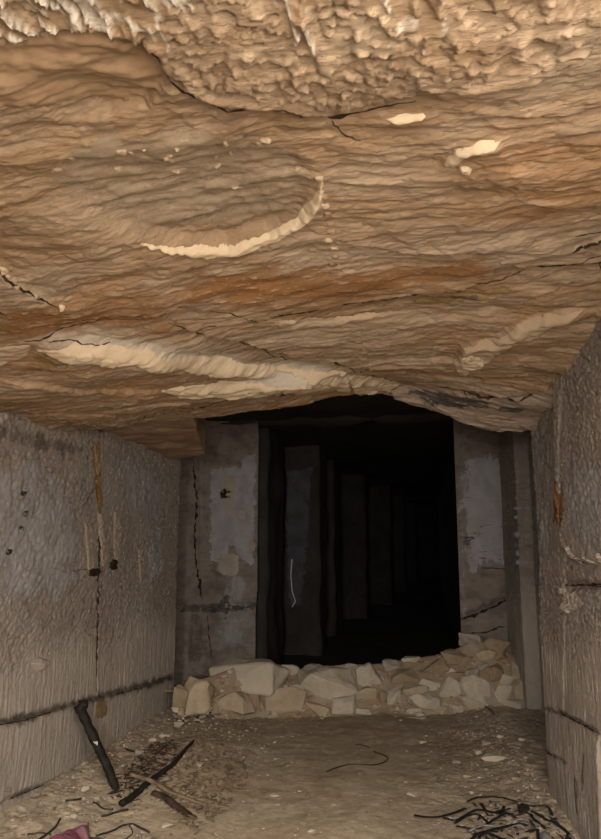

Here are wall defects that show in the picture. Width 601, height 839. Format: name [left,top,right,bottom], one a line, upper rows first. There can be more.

crack [152,54,245,113]
crack [272,101,416,141]
crack [478,232,601,284]
crack [0,267,418,346]
crack [444,385,551,404]
corrosion [553,475,564,526]